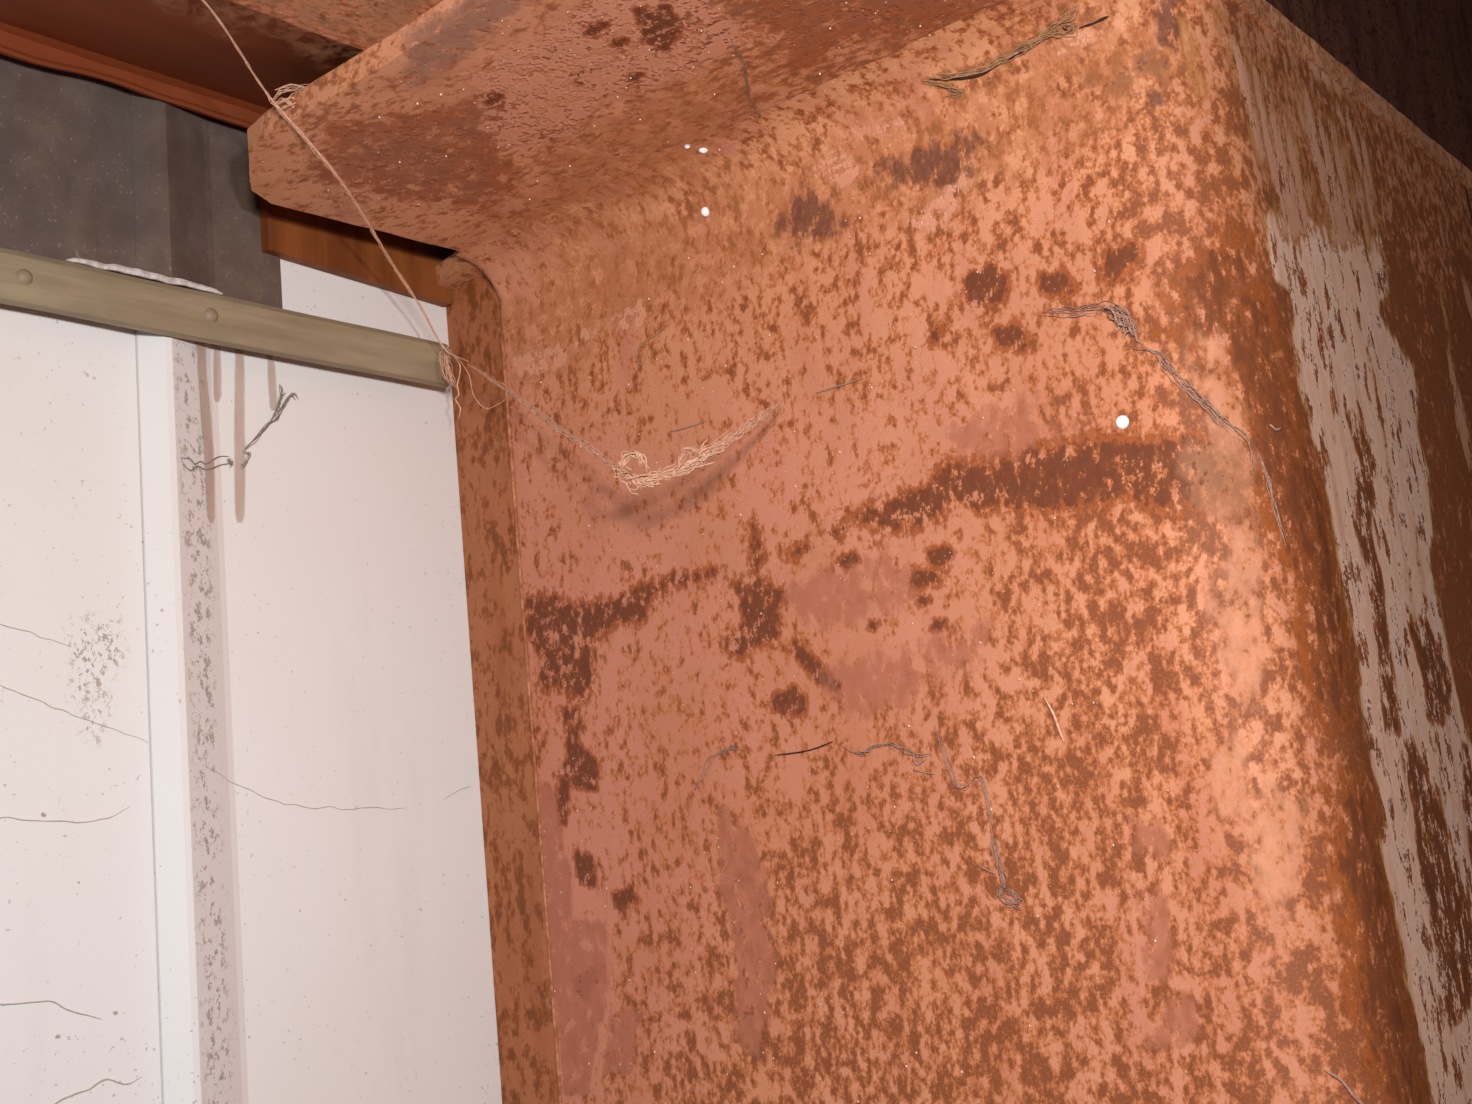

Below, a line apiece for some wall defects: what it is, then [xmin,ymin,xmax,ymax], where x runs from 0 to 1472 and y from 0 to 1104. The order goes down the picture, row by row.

corrosion [581,4,685,54]
corrosion [776,189,847,237]
corrosion [876,132,979,188]
leakage [197,342,245,522]
leakage [268,355,276,410]
peeling [1199,338,1243,454]
peeling [1206,7,1472,1104]
leakage [79,628,115,689]
corrosion [524,517,842,827]
corrosion [785,218,1429,1104]
corrosion [1345,411,1472,1032]
corrosion [573,844,639,914]